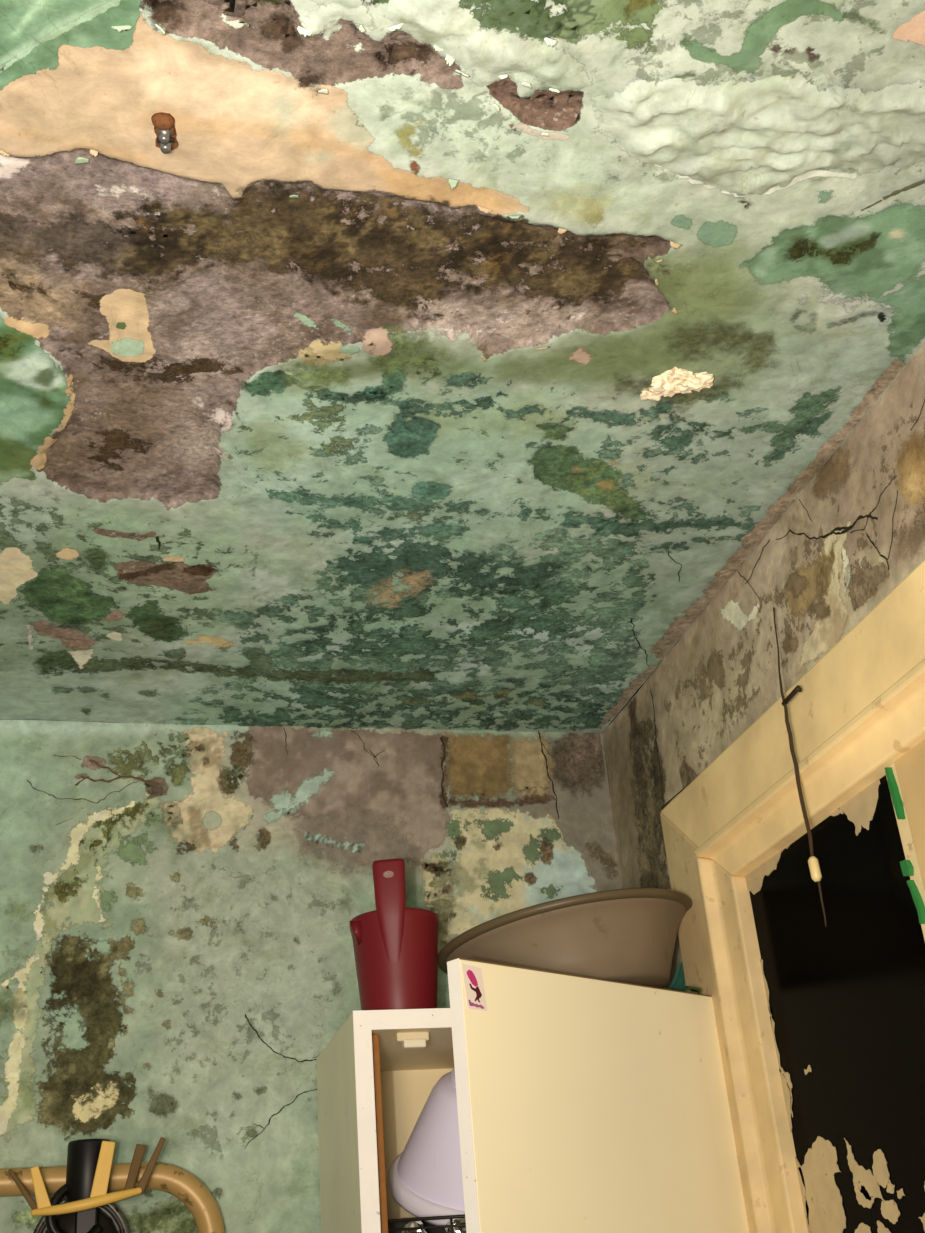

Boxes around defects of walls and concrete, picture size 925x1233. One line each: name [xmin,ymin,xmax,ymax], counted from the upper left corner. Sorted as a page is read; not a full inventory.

spalling [0,0,683,510]
leakage [790,311,886,332]
peeling [55,548,79,560]
peeling [114,555,216,596]
leakage [0,323,841,889]
leakage [665,520,877,788]
crack [737,476,898,602]
leakage [813,449,850,512]
leakage [126,883,143,899]
leakage [168,916,215,940]
peeling [0,724,597,1140]
leakage [37,918,177,1140]